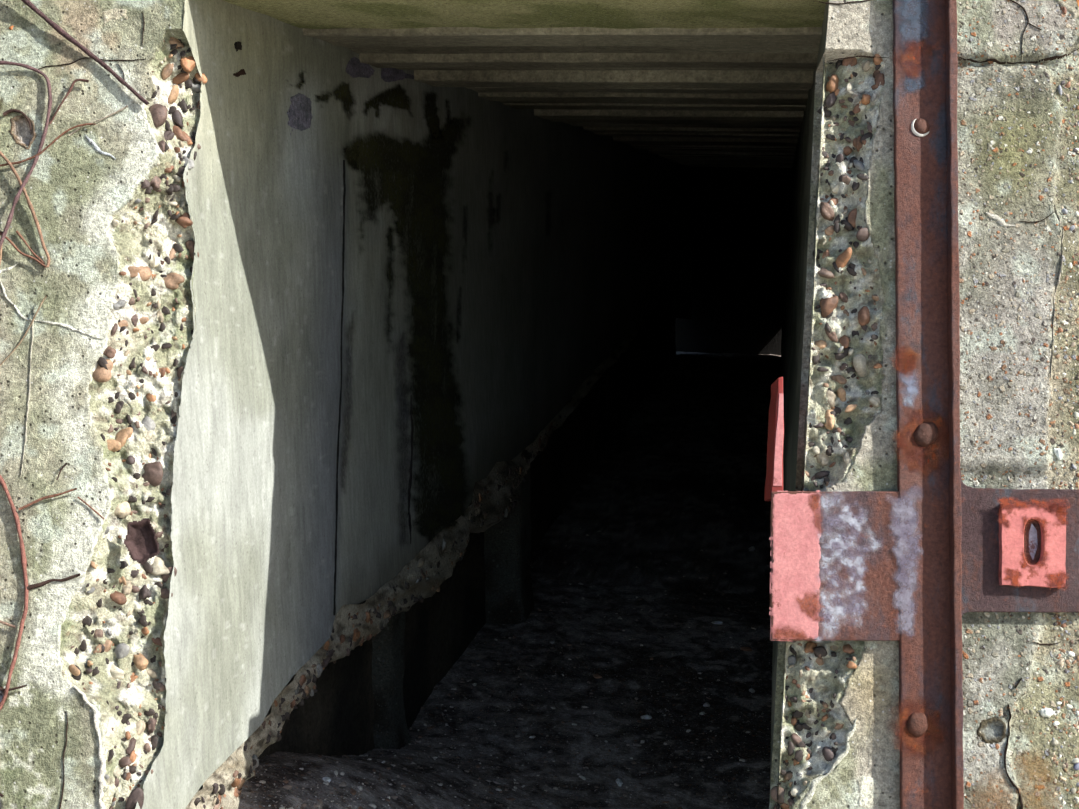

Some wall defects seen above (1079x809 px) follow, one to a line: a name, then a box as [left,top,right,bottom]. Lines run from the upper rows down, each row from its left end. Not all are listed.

spalling [60,35,208,809]
crack [333,160,346,615]
water stain [315,83,471,542]
crack [407,395,415,544]
spalling [185,317,648,809]
corrosion [797,593,822,621]
corrosion [809,494,821,530]
spalling [801,54,887,492]
corrosion [894,350,916,376]
corrosion [998,497,1070,588]
spalling [770,641,864,809]
crack [1004,678,1023,809]